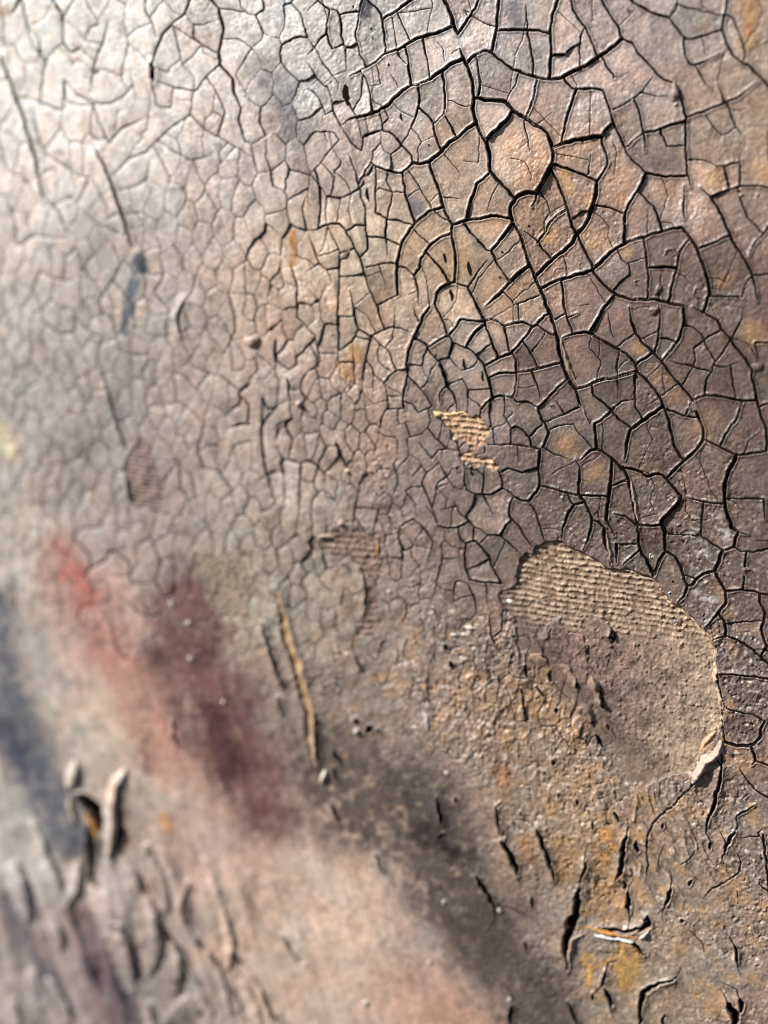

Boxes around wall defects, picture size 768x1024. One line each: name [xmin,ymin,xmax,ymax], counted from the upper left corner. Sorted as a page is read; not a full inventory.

crack [0,0,254,365]
crack [163,0,768,929]
peeling [434,411,499,470]
damp [0,593,93,855]
crack [73,512,175,660]
peeling [490,541,724,780]
crack [585,959,618,1021]
crack [690,931,750,1024]